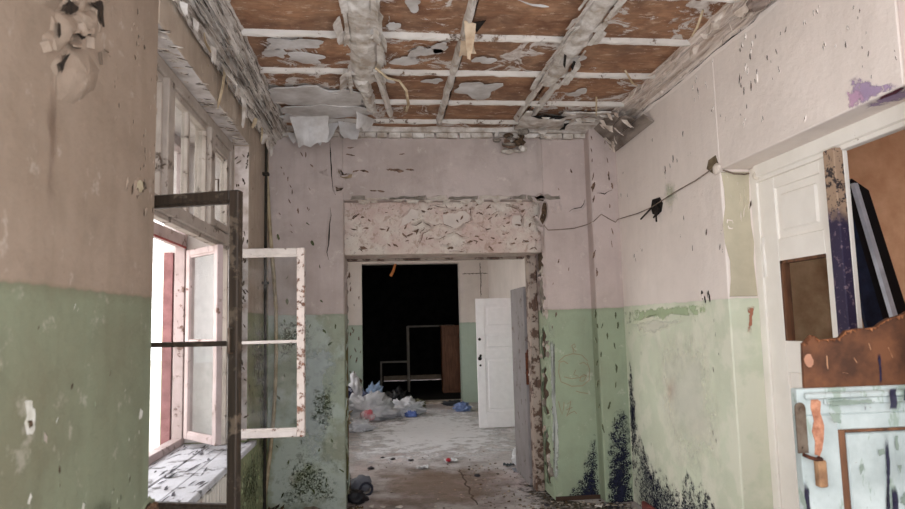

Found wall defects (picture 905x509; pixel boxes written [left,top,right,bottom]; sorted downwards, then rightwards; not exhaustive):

crack [39,0,111,65]
spalling [50,0,105,38]
spalling [51,50,71,75]
peeling [158,0,562,509]
leakage [280,323,297,356]
peeling [23,399,48,445]
peeling [142,445,214,509]
leakage [282,462,333,503]